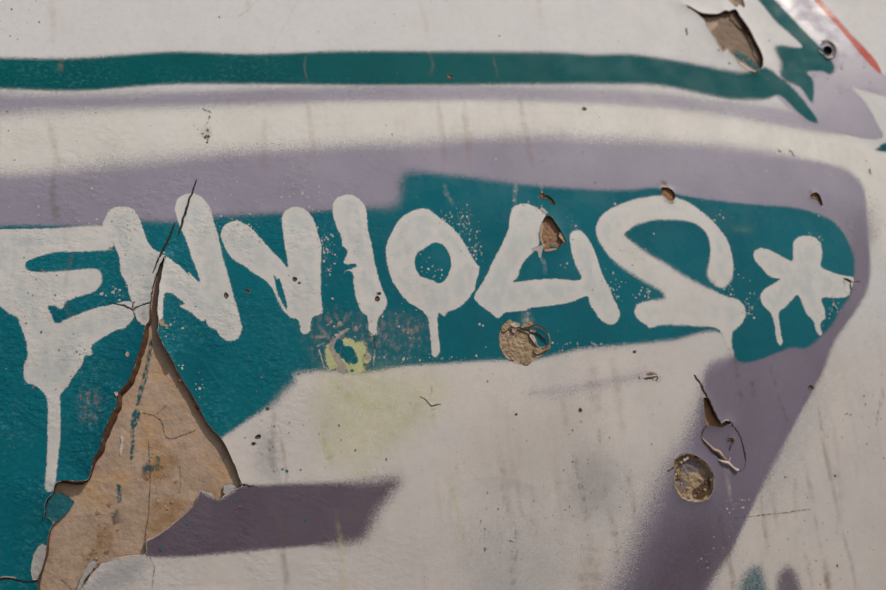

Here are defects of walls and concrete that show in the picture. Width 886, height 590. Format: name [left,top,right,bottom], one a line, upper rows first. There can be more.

peeling [686,0,763,74]
crack [153,179,197,279]
flaking render [531,191,566,258]
peeling [661,182,676,201]
crack [109,302,159,323]
flaking render [499,318,551,366]
peeling [31,260,242,590]
flaking render [667,375,746,502]